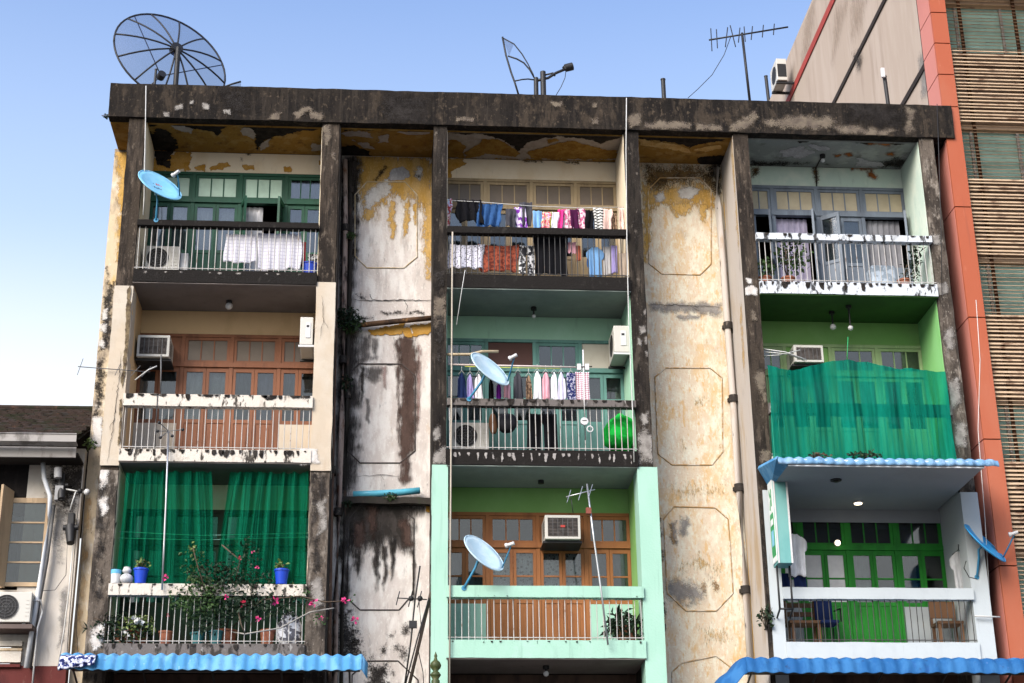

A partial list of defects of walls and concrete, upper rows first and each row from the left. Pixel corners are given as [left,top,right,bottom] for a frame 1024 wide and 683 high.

peeling [149,100,255,172]
water stain [215,87,251,114]
water stain [381,93,432,124]
peeling [448,103,622,178]
water stain [846,103,904,130]
peeling [240,106,432,280]
peeling [641,182,715,262]
water stain [763,281,935,291]
water stain [125,449,306,458]
water stain [453,452,632,464]
water stain [310,331,425,666]
water stain [94,481,109,604]